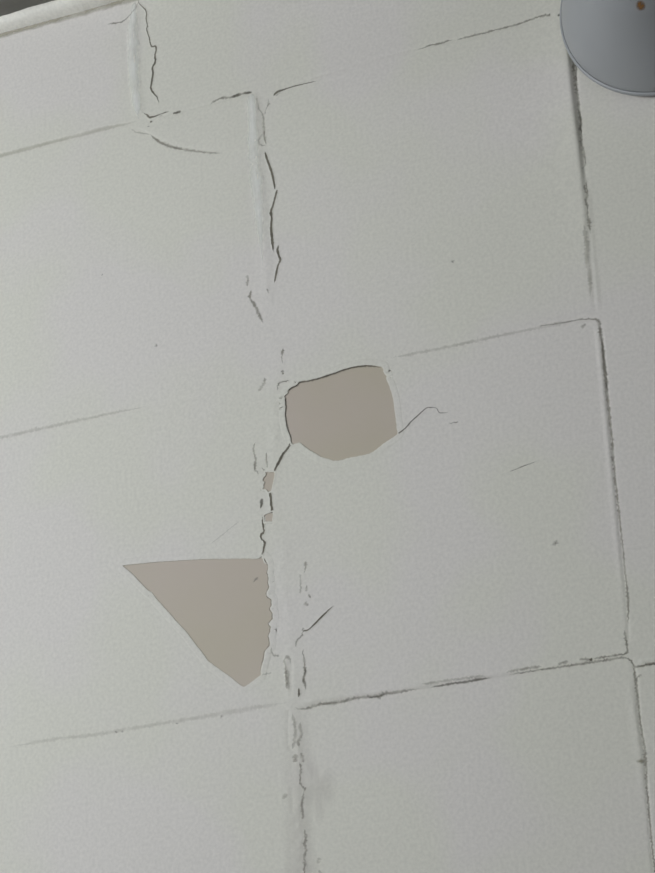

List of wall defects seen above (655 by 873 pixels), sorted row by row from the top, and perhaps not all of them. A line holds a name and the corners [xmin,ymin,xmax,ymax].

crack [112,0,180,123]
crack [273,80,318,96]
crack [264,151,283,283]
peeling [278,359,404,467]
crack [254,443,292,564]
peeling [118,550,279,694]